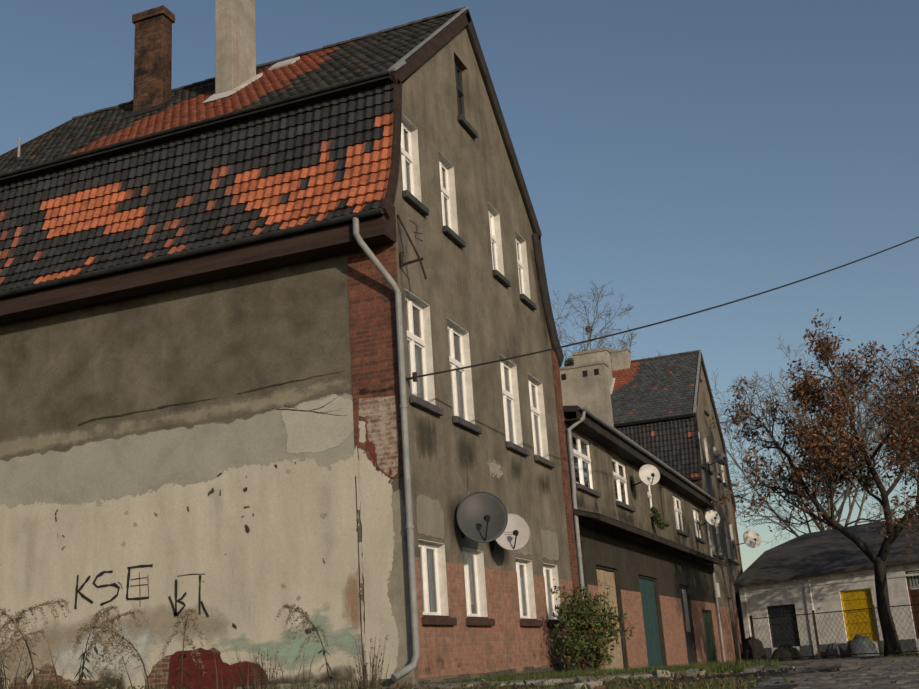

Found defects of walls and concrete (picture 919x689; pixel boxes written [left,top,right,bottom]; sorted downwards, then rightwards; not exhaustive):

crack [78,371,347,426]
peeling [0,378,445,689]